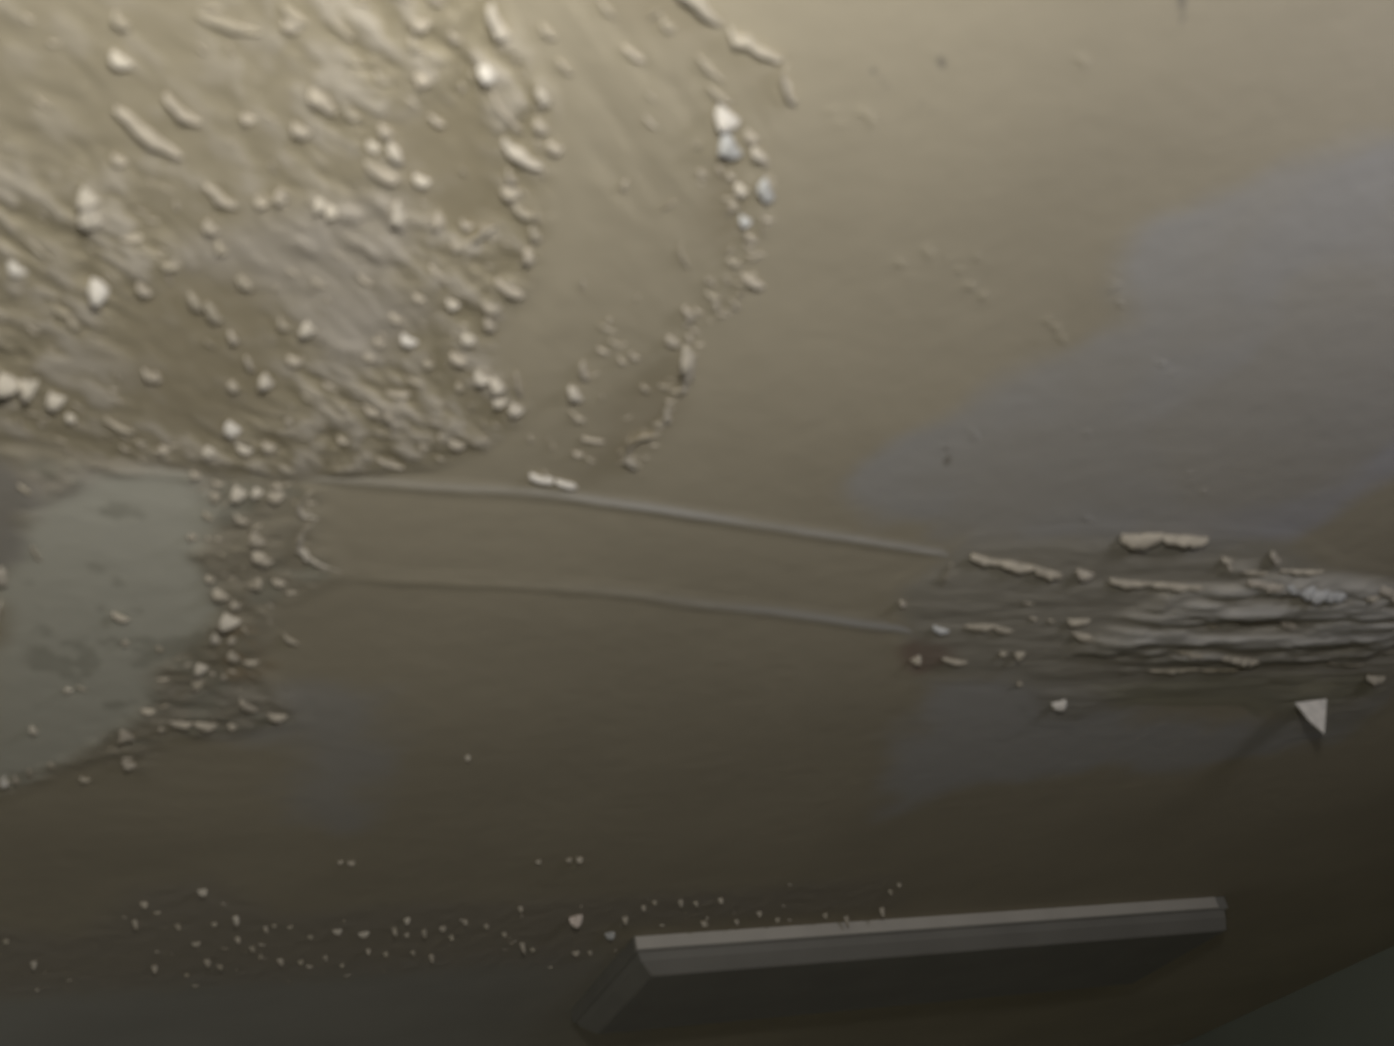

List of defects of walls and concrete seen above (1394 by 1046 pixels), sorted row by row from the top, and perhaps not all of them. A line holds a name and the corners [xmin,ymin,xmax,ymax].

peeling [0,0,826,807]
water stain [790,93,1394,545]
flaking render [871,521,1394,741]
water stain [827,671,1394,837]
peeling [0,862,934,1006]